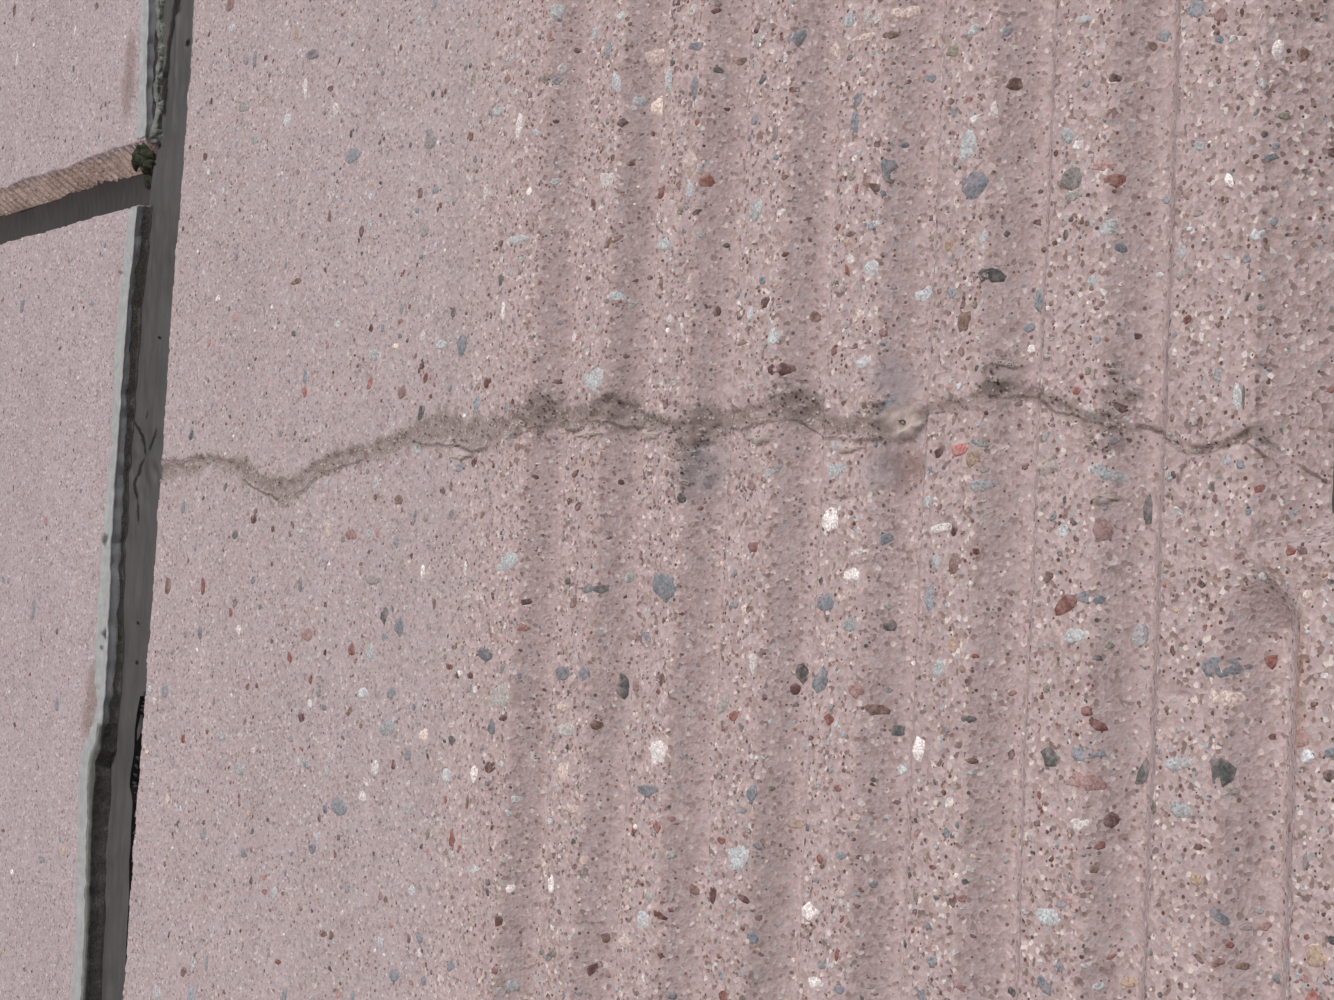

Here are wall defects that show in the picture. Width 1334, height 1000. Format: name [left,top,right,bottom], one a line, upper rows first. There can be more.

crack [162,382,1270,507]